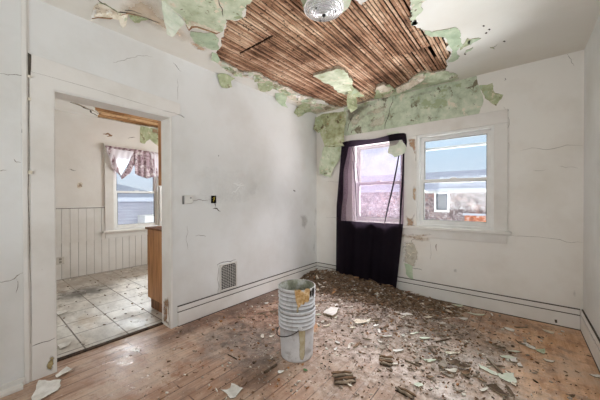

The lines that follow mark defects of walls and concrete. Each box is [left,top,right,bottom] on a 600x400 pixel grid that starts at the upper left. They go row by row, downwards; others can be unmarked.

peeling [161,0,503,177]